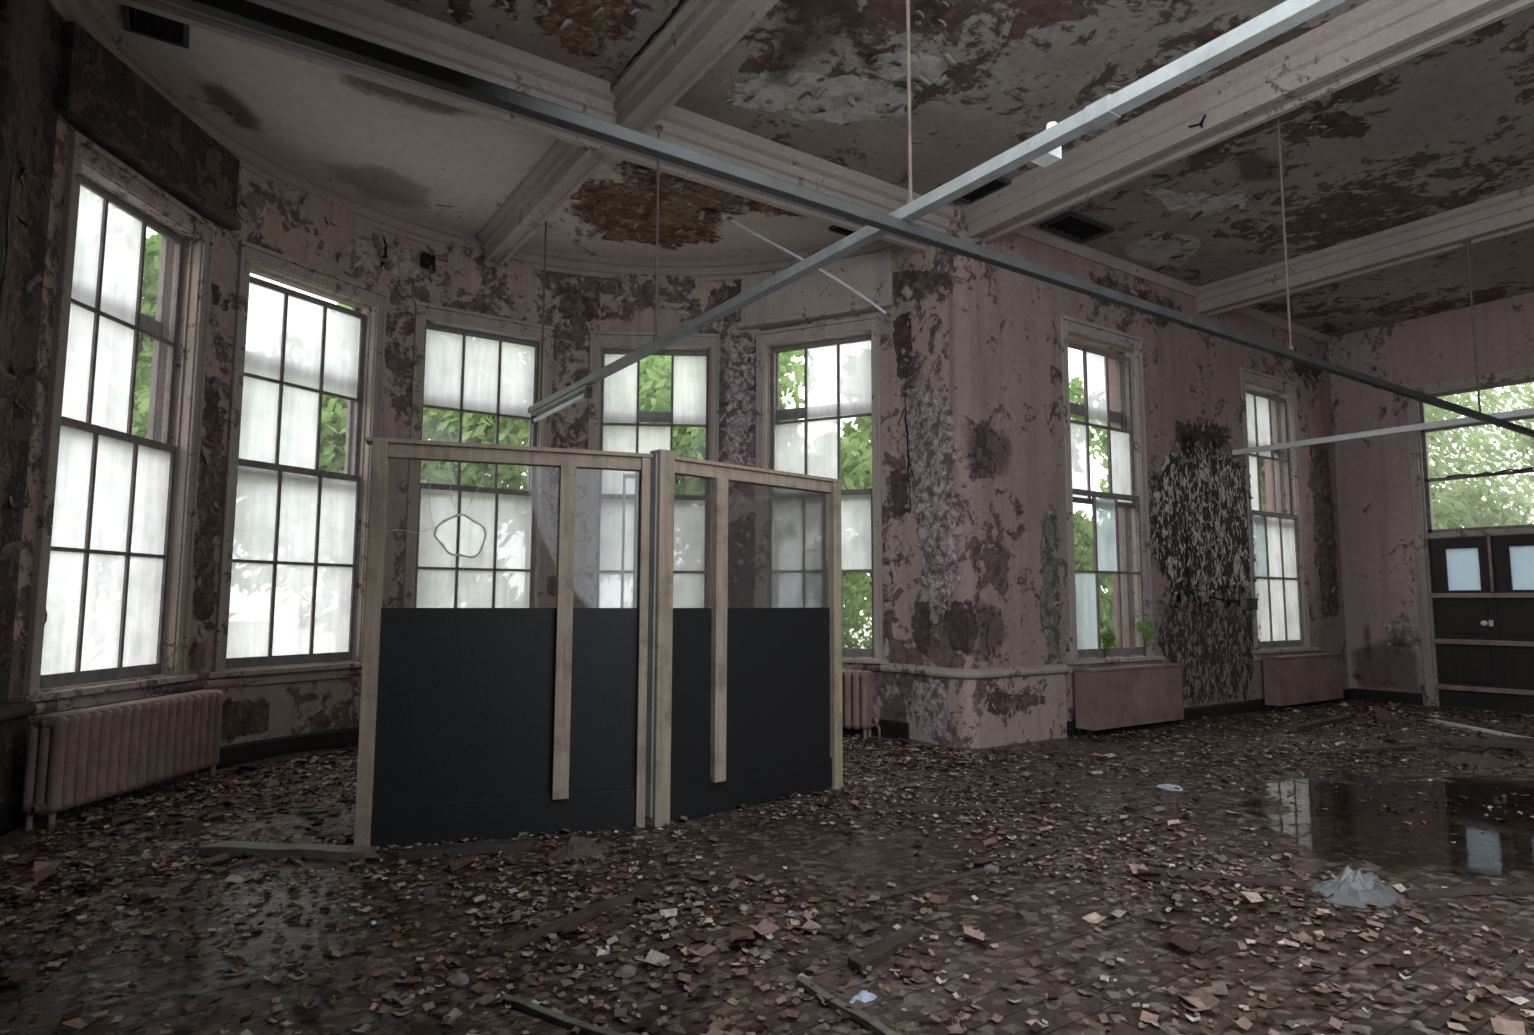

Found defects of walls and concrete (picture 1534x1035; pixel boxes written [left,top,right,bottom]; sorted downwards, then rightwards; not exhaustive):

peeling [445,0,476,27]
peeling [533,0,640,63]
peeling [1199,31,1227,47]
peeling [721,48,957,127]
peeling [1308,111,1371,139]
peeling [1124,186,1263,271]
flaking render [420,252,436,271]
flaking render [210,282,231,311]
peeling [557,286,608,325]
peeling [701,281,741,331]
peeling [717,345,756,467]
peeling [977,684,1047,719]